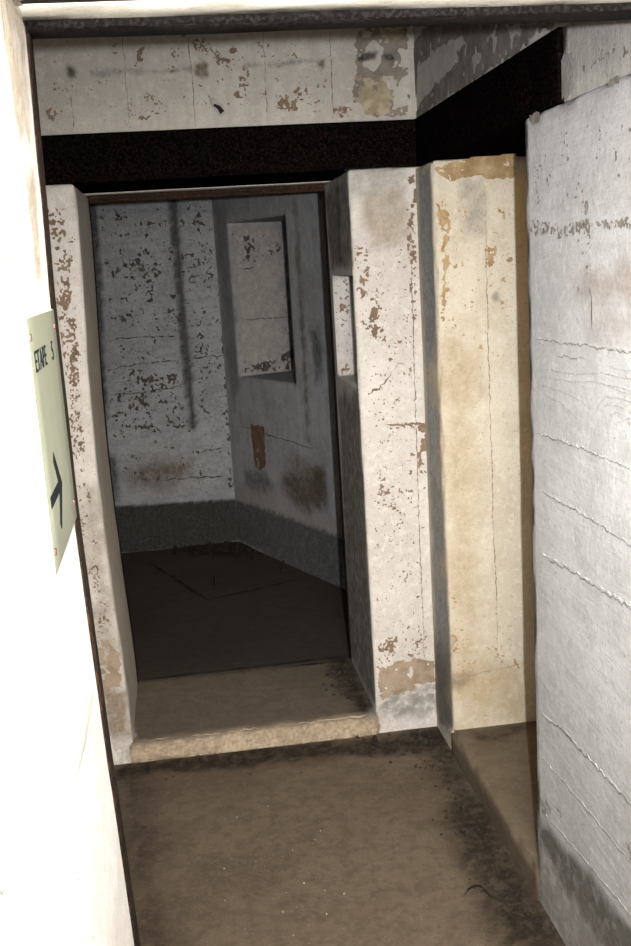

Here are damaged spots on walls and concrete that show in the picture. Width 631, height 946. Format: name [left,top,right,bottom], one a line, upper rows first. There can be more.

peeling [192,39,250,116]
peeling [260,23,554,118]
peeling [435,154,516,181]
peeling [48,208,98,544]
crack [538,433,631,471]
water stain [116,395,375,703]
crack [539,553,631,610]
crack [546,494,631,547]
water stain [193,714,368,736]
peeling [377,620,436,700]
water stain [380,658,464,729]
water stain [540,829,631,946]